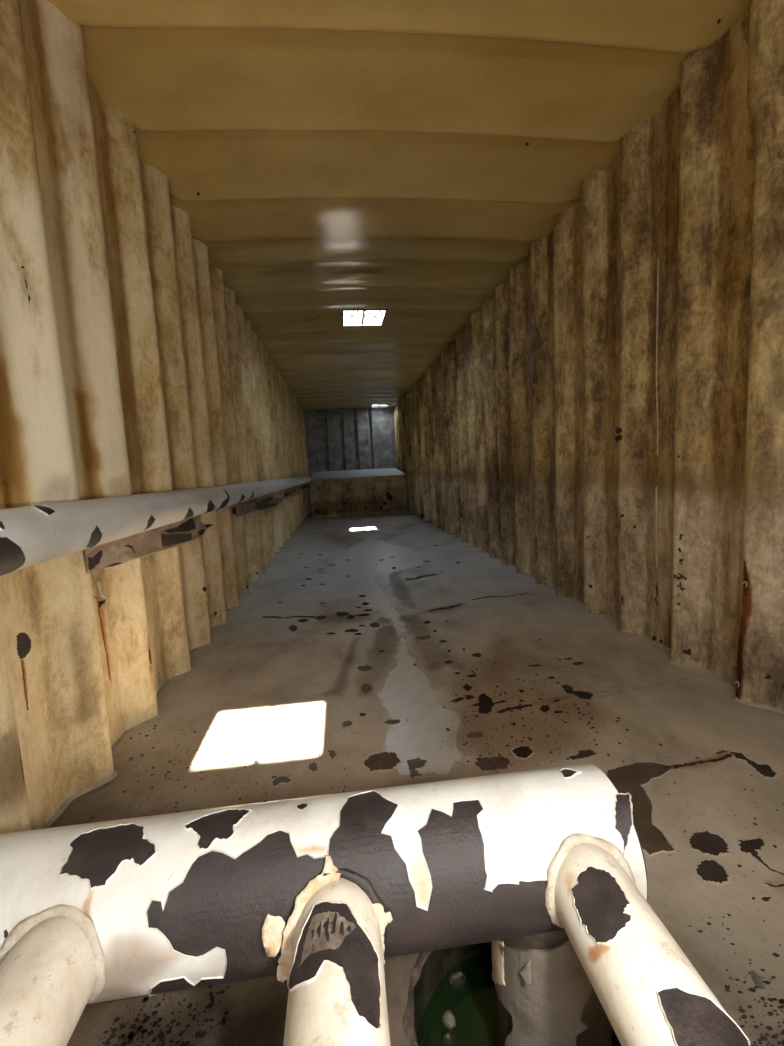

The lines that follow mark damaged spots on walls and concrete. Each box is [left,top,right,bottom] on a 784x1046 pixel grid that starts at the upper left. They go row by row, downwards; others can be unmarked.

peeling [0,521,26,577]
peeling [29,505,56,517]
peeling [87,525,103,570]
peeling [165,500,215,536]
rust [92,580,110,680]
rust [736,561,750,699]
peeling [559,768,582,779]
spalling [606,762,677,857]
peeling [58,823,158,891]
peeling [145,790,564,1046]
peeling [570,865,633,946]
peeling [656,986,751,1046]